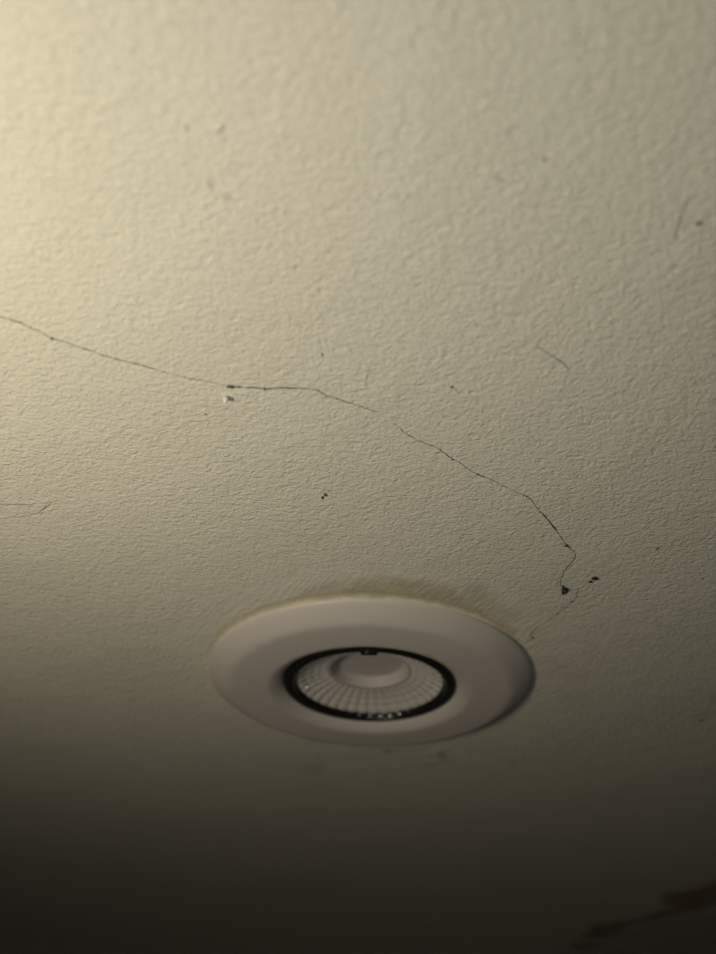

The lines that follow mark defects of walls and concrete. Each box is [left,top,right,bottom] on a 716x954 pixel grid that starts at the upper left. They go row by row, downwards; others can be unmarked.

crack [401,429,599,615]